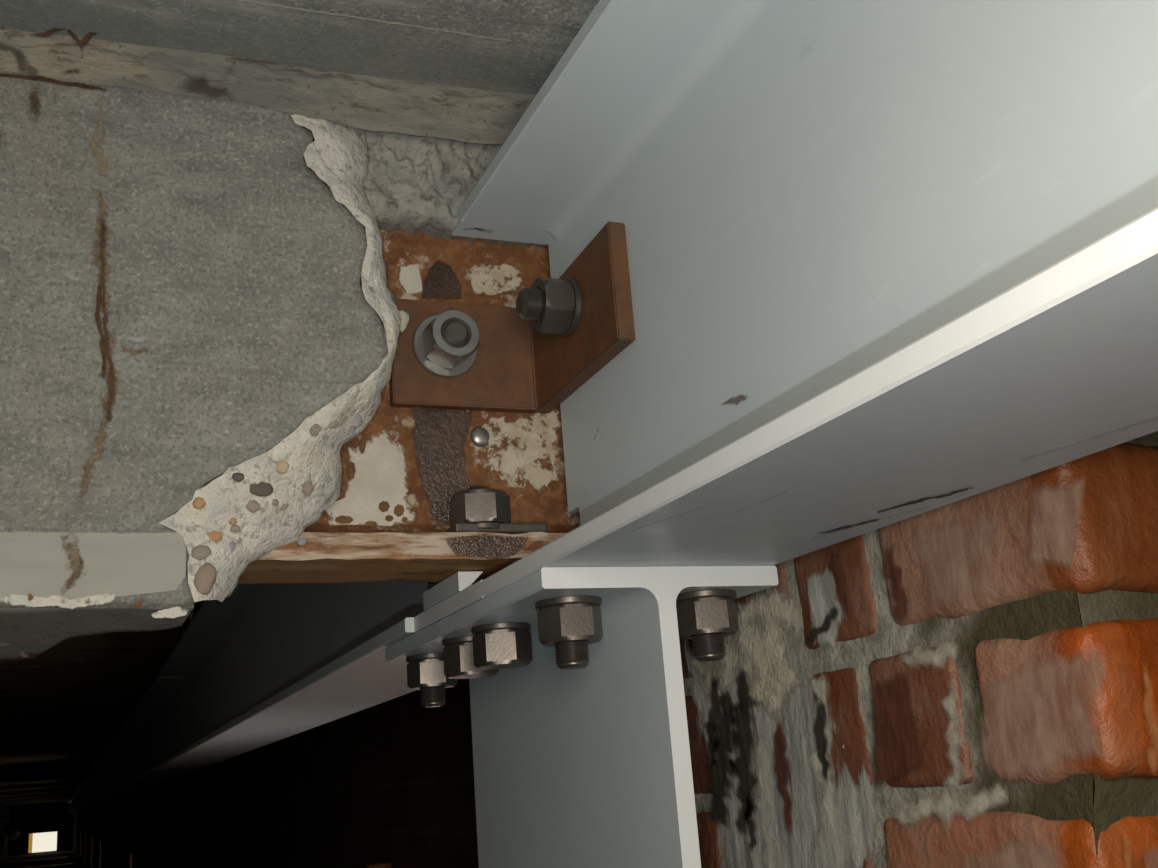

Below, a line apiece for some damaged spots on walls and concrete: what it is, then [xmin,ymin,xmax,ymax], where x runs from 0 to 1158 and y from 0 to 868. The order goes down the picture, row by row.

rust [422,261,461,299]
spalling [152,114,548,618]
rust [412,407,473,524]
efflorescence [1031,483,1082,564]
peeling [0,592,117,609]
water stain [684,549,957,868]
efflorescence [983,656,1103,775]
water stain [898,784,1005,824]